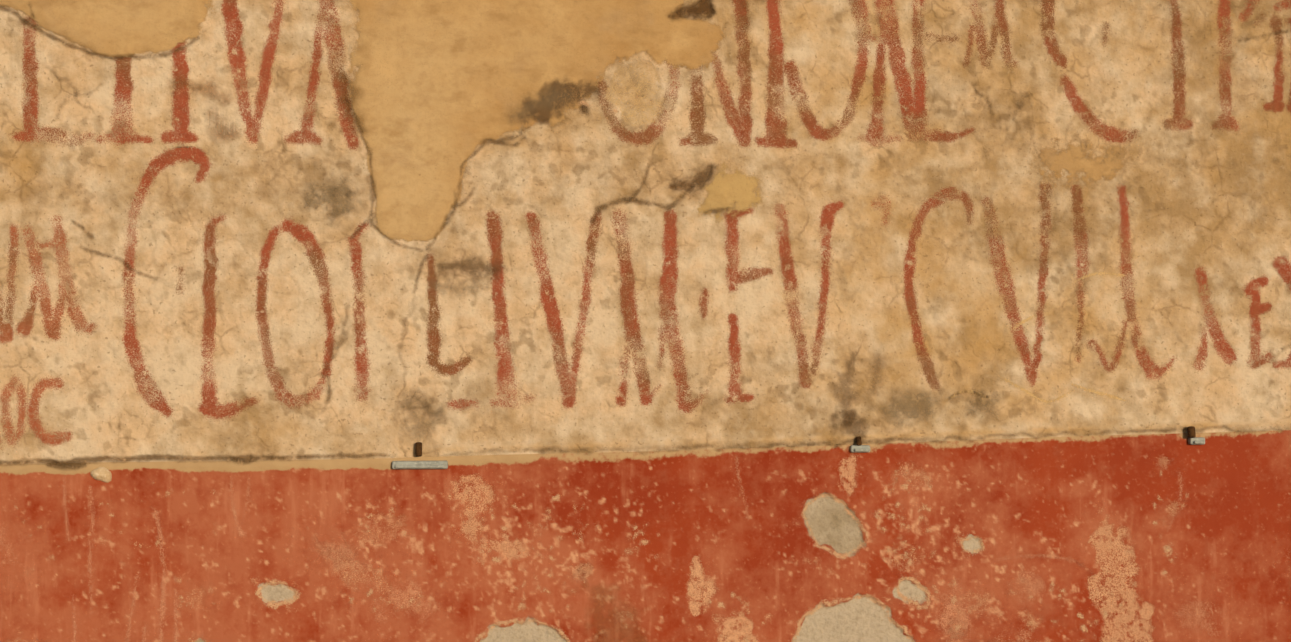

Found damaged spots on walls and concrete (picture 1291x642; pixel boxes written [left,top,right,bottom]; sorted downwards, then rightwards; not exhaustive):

flaking render [669,0,715,19]
flaking render [670,165,715,191]
flaking render [447,473,598,642]
flaking render [792,455,1059,642]
flaking render [251,576,302,611]